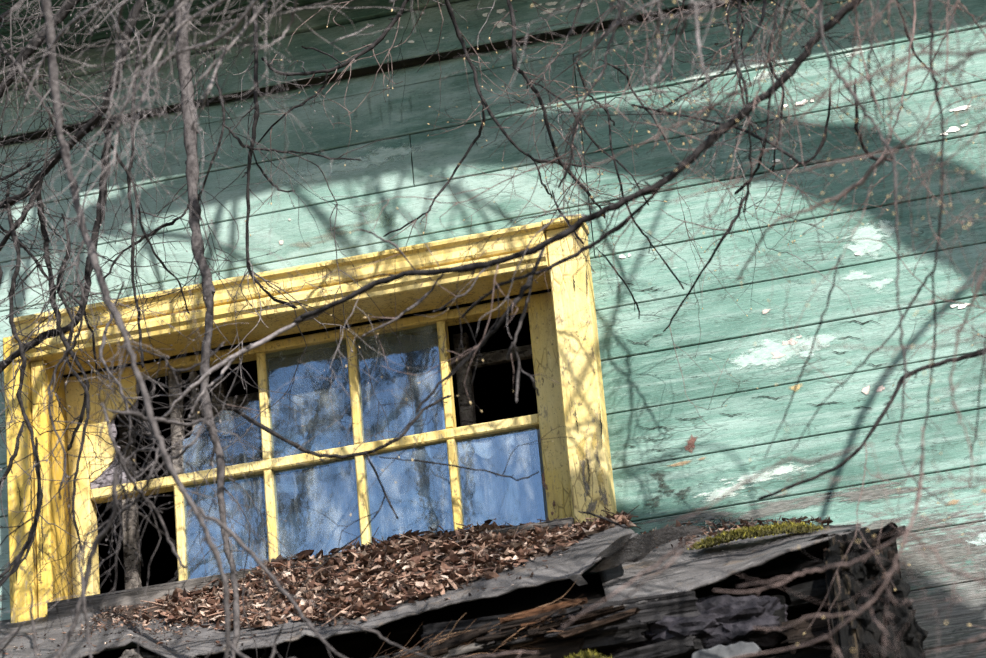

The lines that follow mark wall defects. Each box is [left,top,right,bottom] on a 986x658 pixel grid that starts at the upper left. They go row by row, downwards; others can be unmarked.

peeling [842,220,896,258]
peeling [844,271,893,291]
peeling [731,334,836,369]
peeling [576,432,608,518]
peeling [634,462,930,526]
peeling [861,511,986,579]